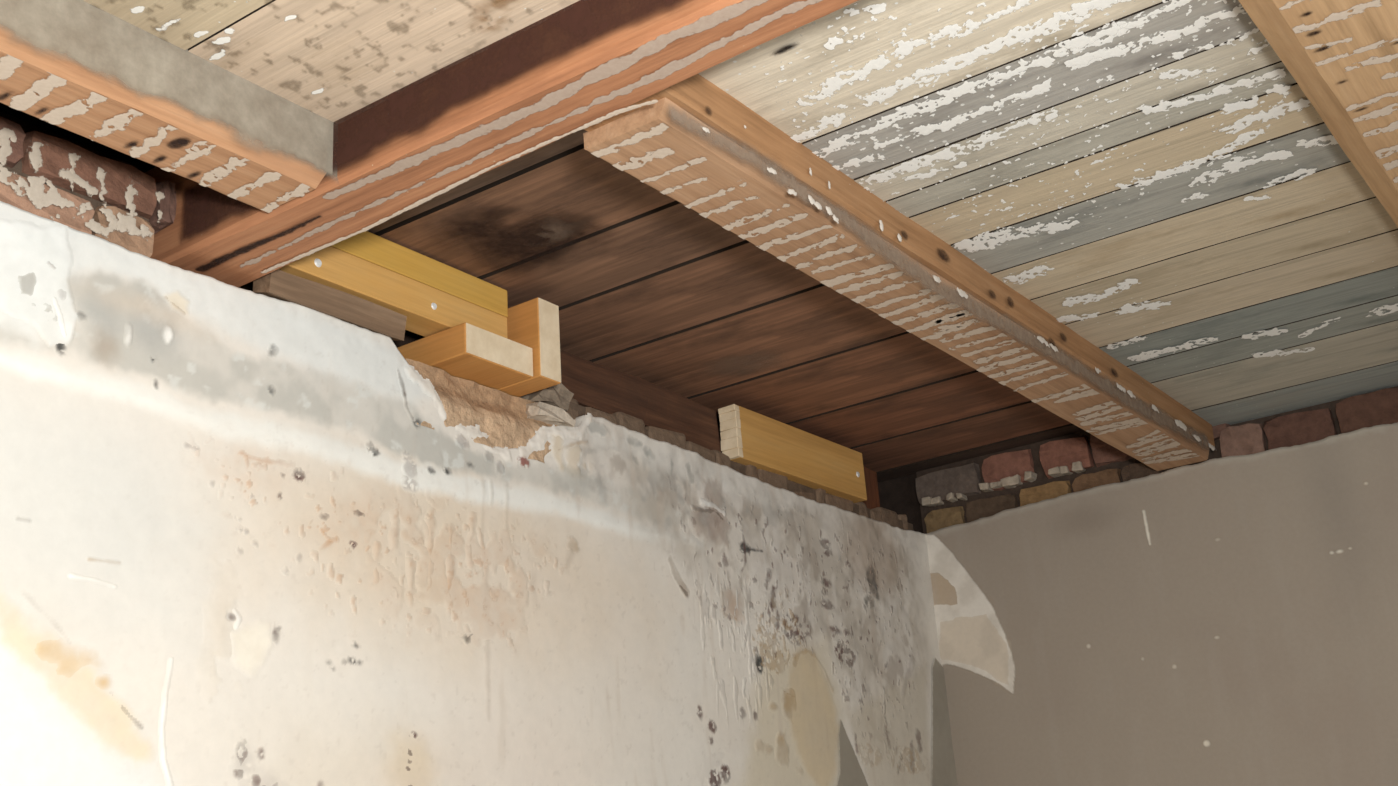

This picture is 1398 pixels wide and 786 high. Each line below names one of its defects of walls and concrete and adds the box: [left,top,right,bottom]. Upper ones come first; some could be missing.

flaking render [0,116,177,350]
peeling [161,288,192,347]
water stain [182,184,255,239]
water stain [240,0,822,273]
water stain [364,439,383,459]
water stain [399,433,531,577]
flaking render [404,358,1398,554]
water stain [0,562,158,773]
water stain [663,471,1016,786]